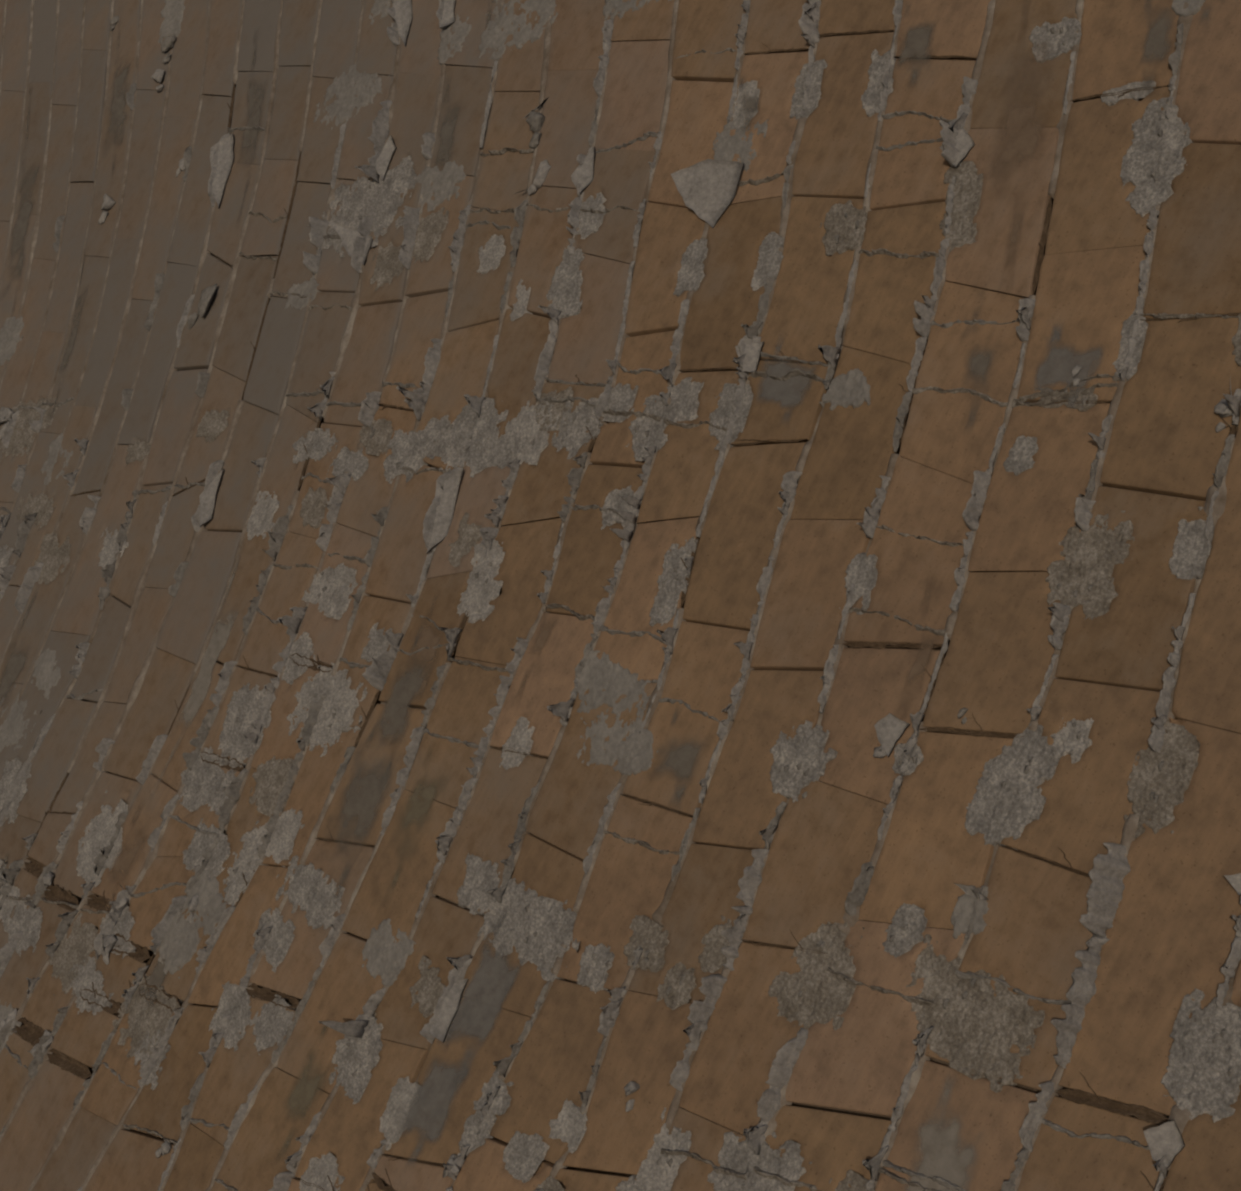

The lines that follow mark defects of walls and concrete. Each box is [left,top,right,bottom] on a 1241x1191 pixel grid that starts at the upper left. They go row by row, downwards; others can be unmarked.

crack [743,30,977,61]
spalling [1101,80,1194,217]
crack [1032,197,1054,295]
spalling [292,322,765,554]
spalling [270,556,404,757]
crack [843,639,1021,738]
spalling [965,706,1094,850]
crack [24,773,182,1029]
spalling [457,853,615,994]
crack [15,1017,93,1079]
crack [1055,1073,1171,1124]
spalling [1132,988,1241,1178]